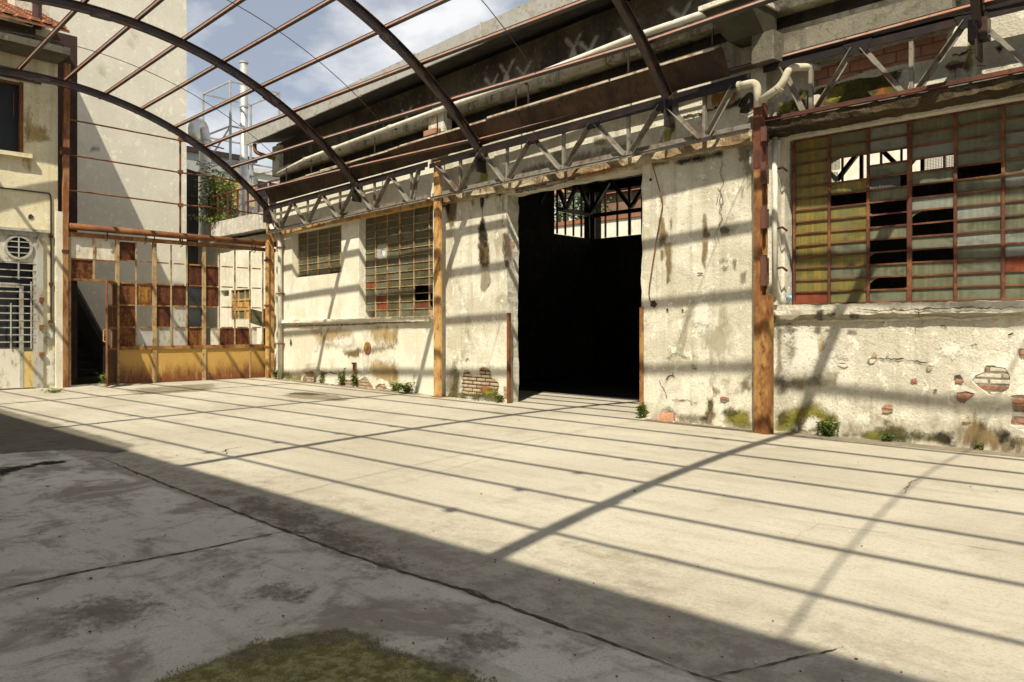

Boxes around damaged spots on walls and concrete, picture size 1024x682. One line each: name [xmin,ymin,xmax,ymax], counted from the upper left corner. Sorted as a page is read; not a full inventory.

crack [714,157,726,243]
water stain [315,326,397,385]
spalling [461,367,499,395]
spalling [933,348,1024,445]